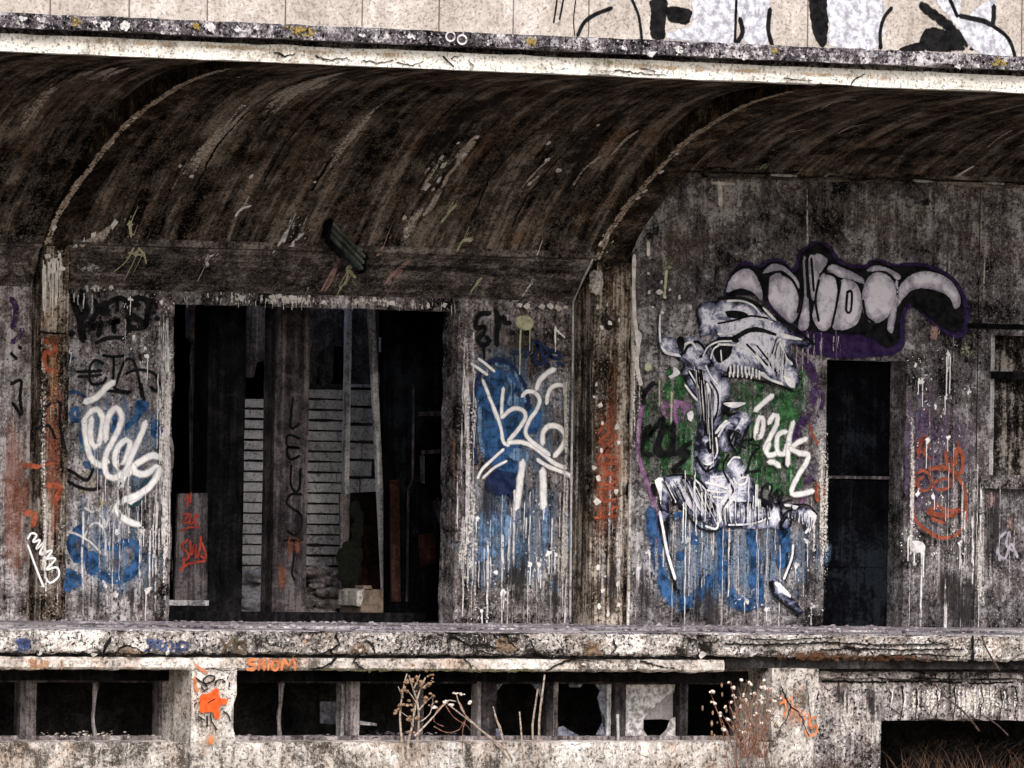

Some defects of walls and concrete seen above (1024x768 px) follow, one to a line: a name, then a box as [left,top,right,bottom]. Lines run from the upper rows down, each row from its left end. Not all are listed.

damp [711,181,735,207]
peeling [41,251,66,324]
damp [575,324,591,593]
crack [312,634,364,670]
crack [449,633,675,671]